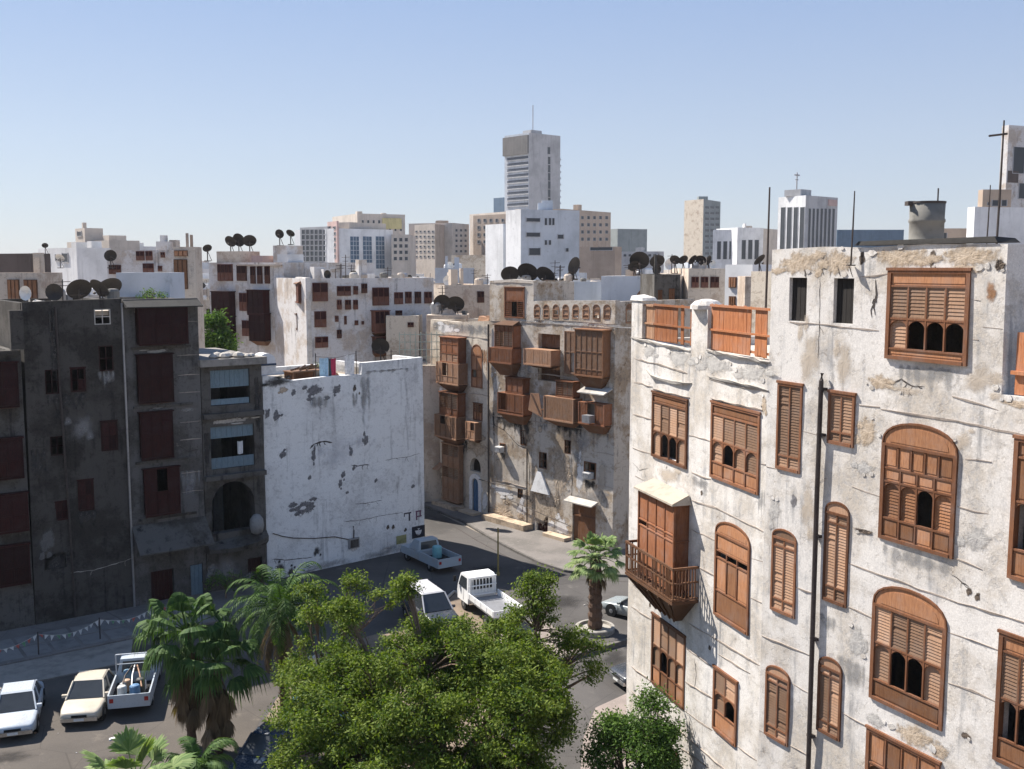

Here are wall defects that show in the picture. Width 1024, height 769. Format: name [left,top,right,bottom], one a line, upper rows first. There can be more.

flaking render [771,244,1006,278]
spalling [262,375,360,401]
spalling [865,374,916,394]
spalling [288,497,317,516]